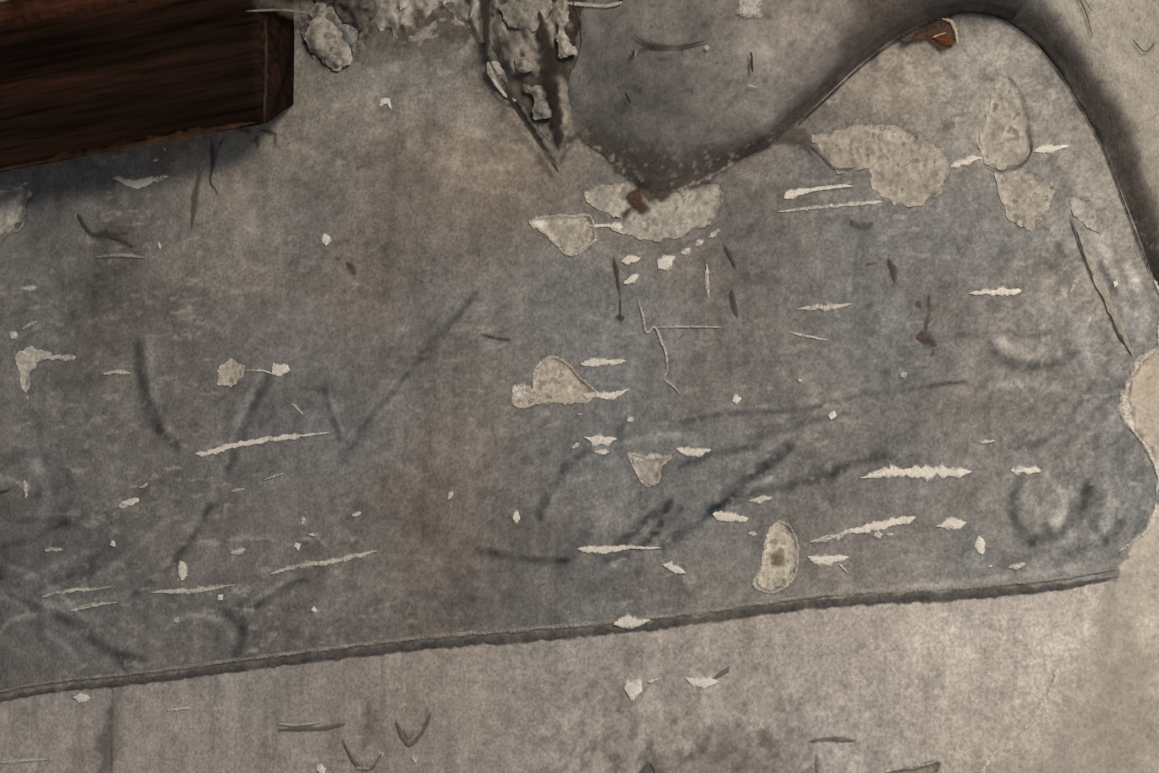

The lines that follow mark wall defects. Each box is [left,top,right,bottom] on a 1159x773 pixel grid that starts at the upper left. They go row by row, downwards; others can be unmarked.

rust [907,18,958,51]
spalling [299,0,622,172]
spalling [811,123,954,207]
spalling [978,72,1058,232]
spalling [529,181,724,270]
peeling [621,255,641,284]
spalling [512,356,598,415]
peeling [1011,465,1041,475]
spalling [713,511,799,594]
peeling [937,517,967,530]
peeling [1090,326,1159,773]
peeling [614,614,651,629]